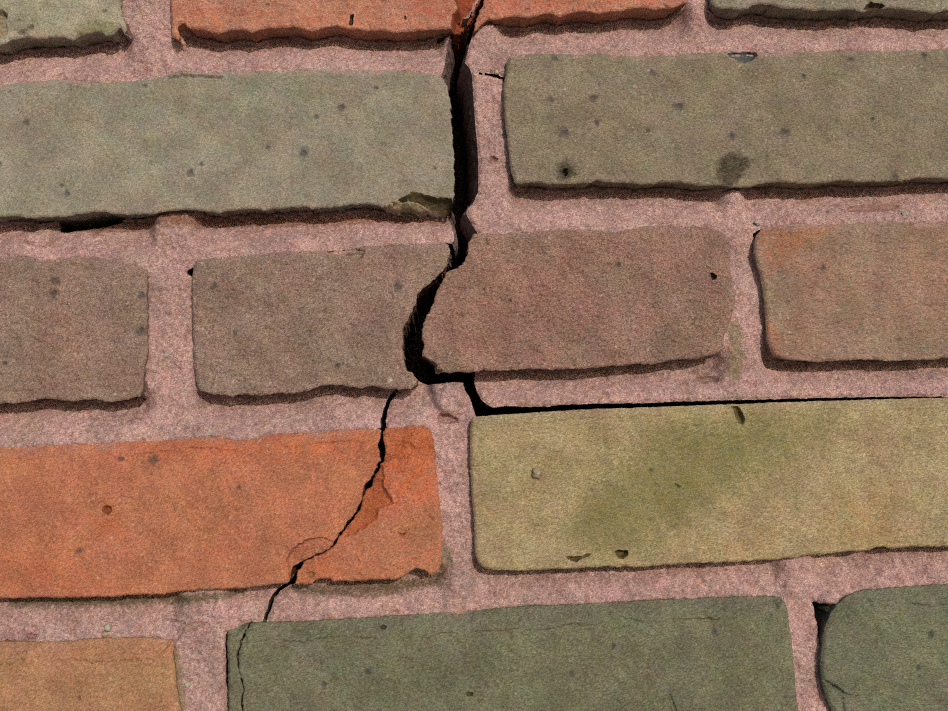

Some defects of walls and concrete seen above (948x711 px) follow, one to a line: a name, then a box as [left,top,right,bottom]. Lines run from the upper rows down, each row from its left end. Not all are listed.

spalling [384,191,452,219]
crack [225,0,948,711]
crack [161,619,208,642]